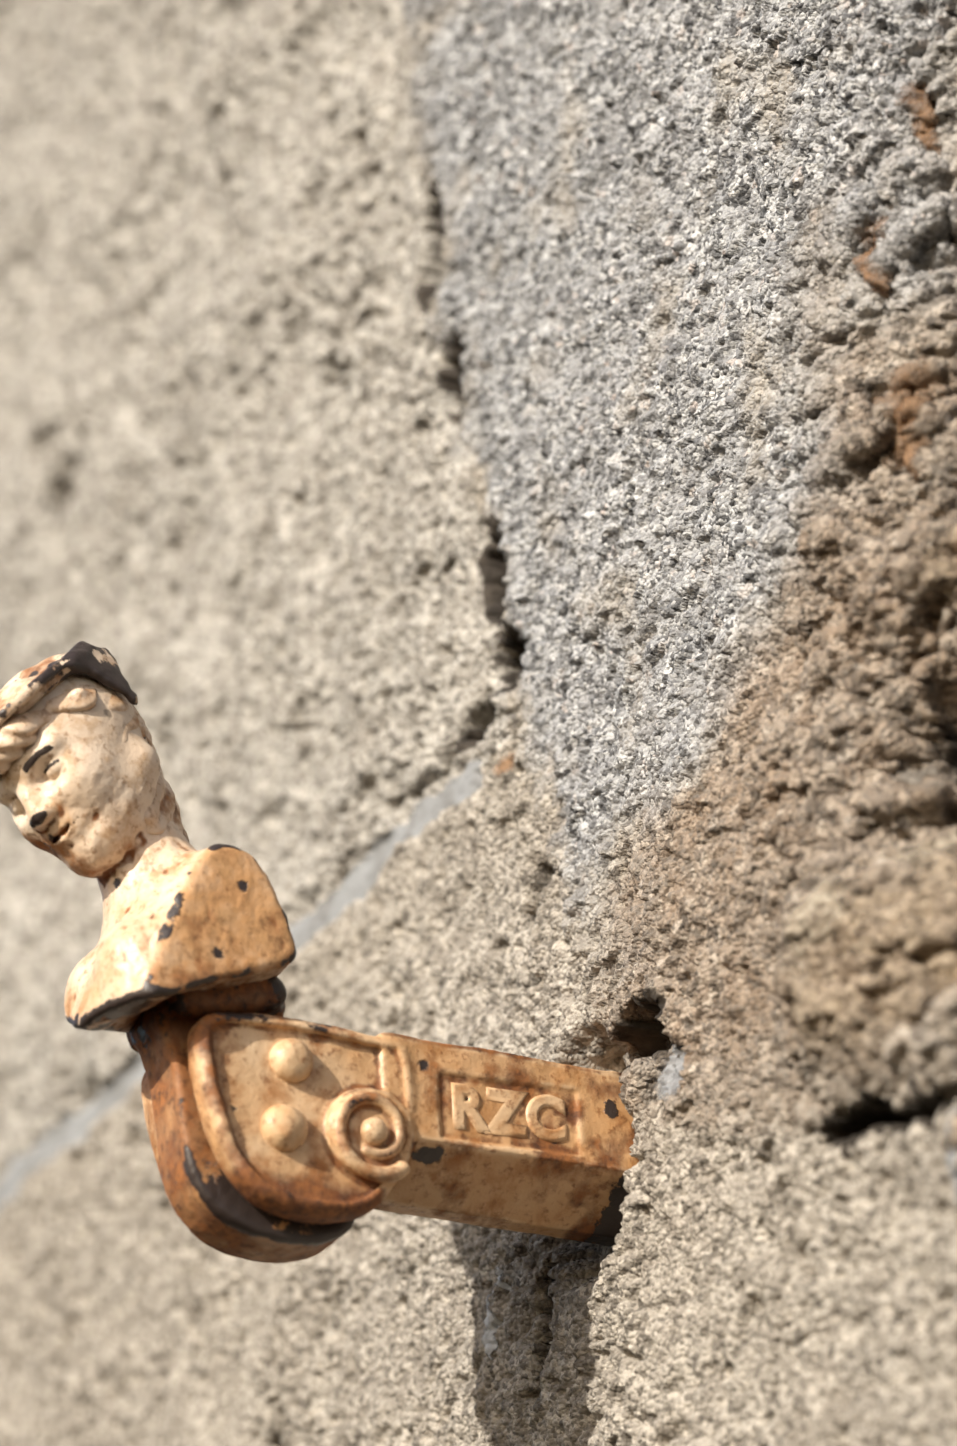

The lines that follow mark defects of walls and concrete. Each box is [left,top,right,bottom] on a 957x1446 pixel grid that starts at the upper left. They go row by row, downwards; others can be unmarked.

corrosion [909,85,941,155]
corrosion [854,227,892,298]
corrosion [893,374,931,481]
spalling [891,729,957,784]
spalling [598,987,687,1095]